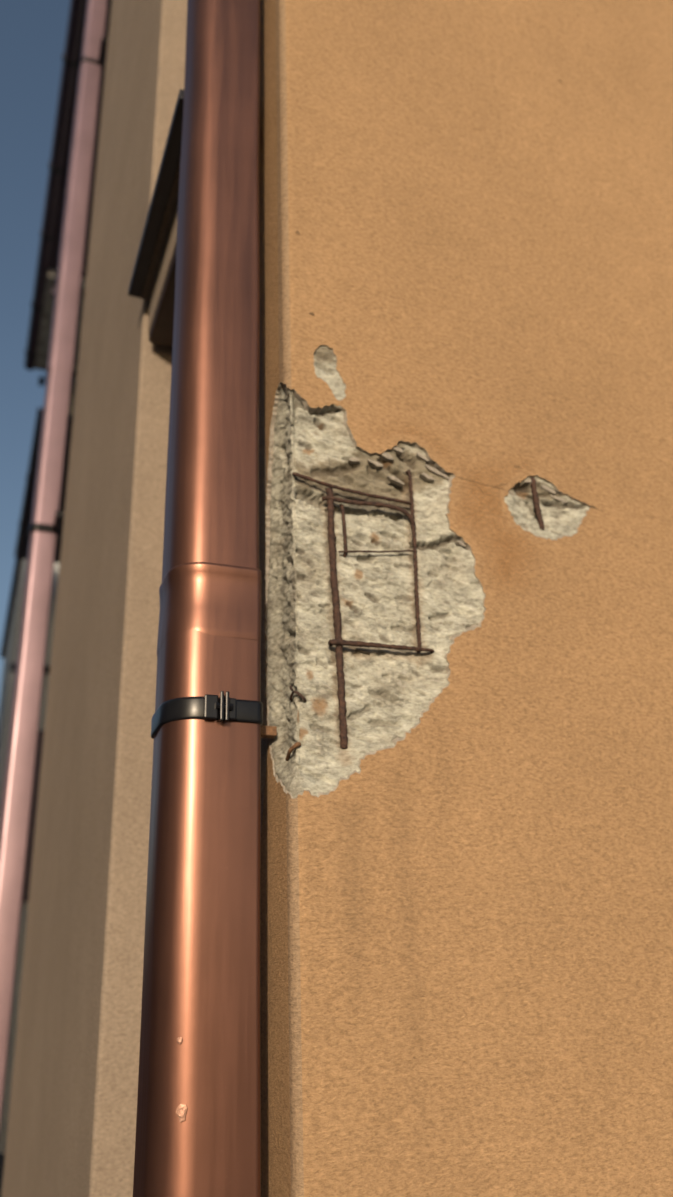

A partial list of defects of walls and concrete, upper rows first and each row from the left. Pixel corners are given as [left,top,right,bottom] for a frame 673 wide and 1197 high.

spalling [265,345,486,799]
spalling [504,475,590,540]